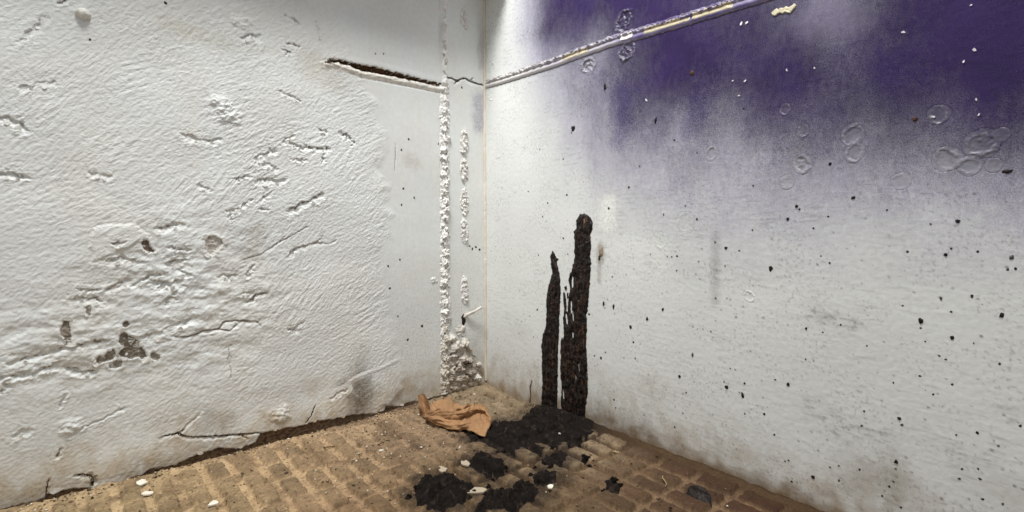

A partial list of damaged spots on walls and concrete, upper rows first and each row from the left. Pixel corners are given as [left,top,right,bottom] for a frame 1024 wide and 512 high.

crack [447,77,483,85]
flaking render [0,123,361,412]
crack [174,292,268,377]
crack [161,429,261,438]